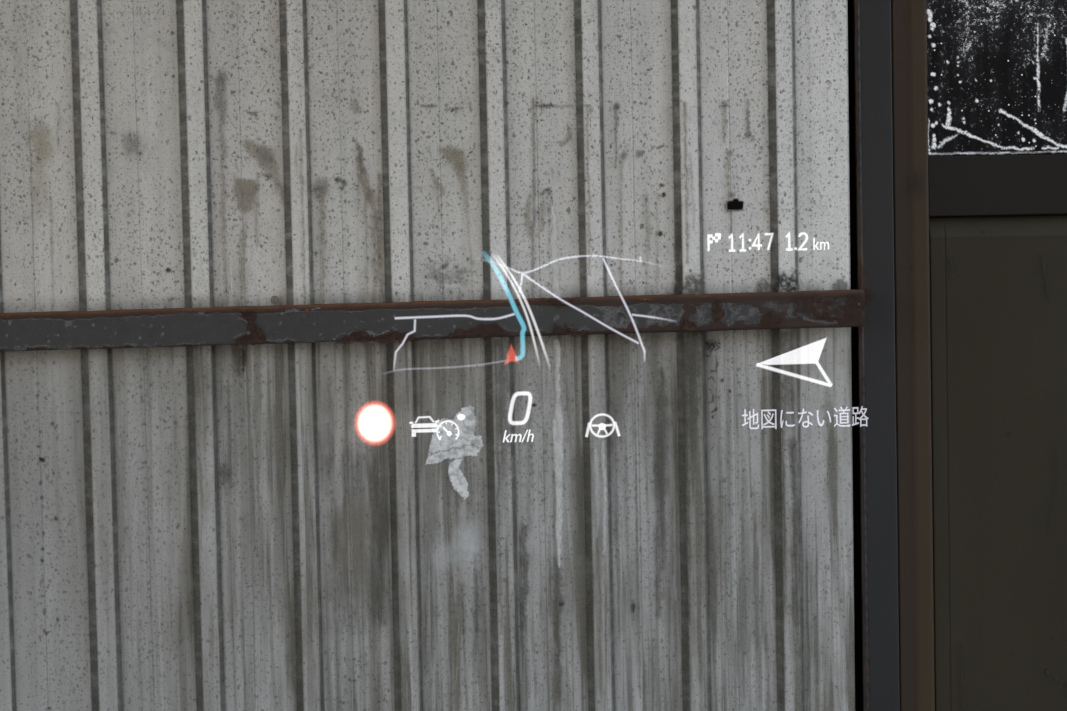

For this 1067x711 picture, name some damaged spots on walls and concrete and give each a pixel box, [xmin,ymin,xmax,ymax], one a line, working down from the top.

water stain [216,73,283,233]
water stain [357,149,383,302]
corrosion [232,311,266,374]
corrosion [333,329,419,344]
corrosion [448,323,511,340]
corrosion [541,298,574,307]
water stain [553,340,563,661]